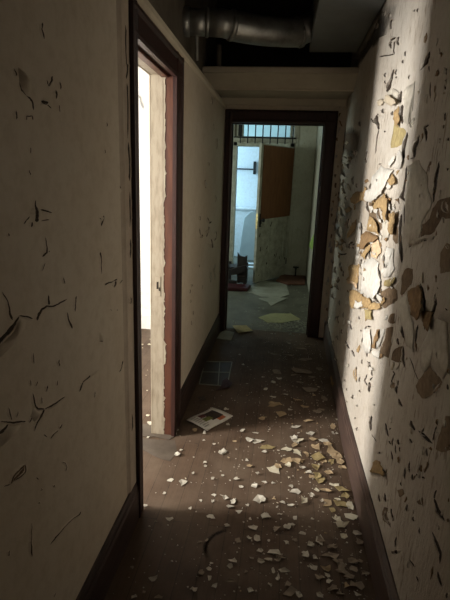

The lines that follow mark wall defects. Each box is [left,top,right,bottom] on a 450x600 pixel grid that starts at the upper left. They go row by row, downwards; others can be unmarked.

crack [22,200,52,227]
peeling [326,38,450,407]
crack [0,278,78,358]
crack [0,369,99,447]
peeling [370,416,450,599]